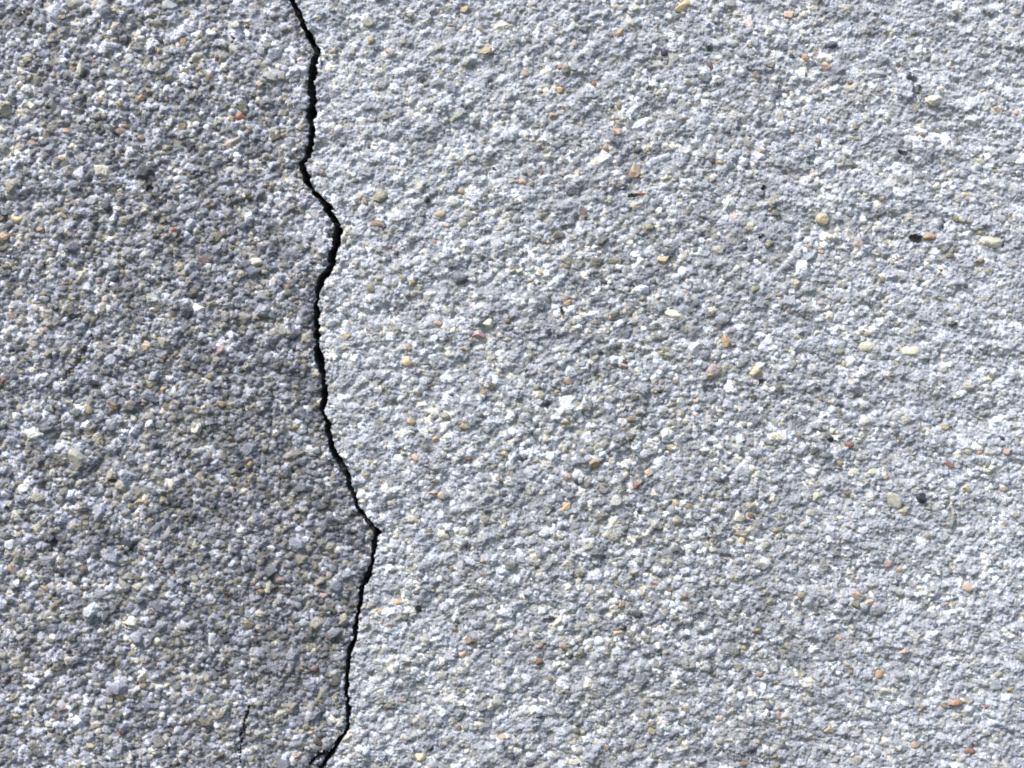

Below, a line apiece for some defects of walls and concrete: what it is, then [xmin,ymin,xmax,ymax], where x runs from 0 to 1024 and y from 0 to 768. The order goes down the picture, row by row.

crack [289,0,382,768]